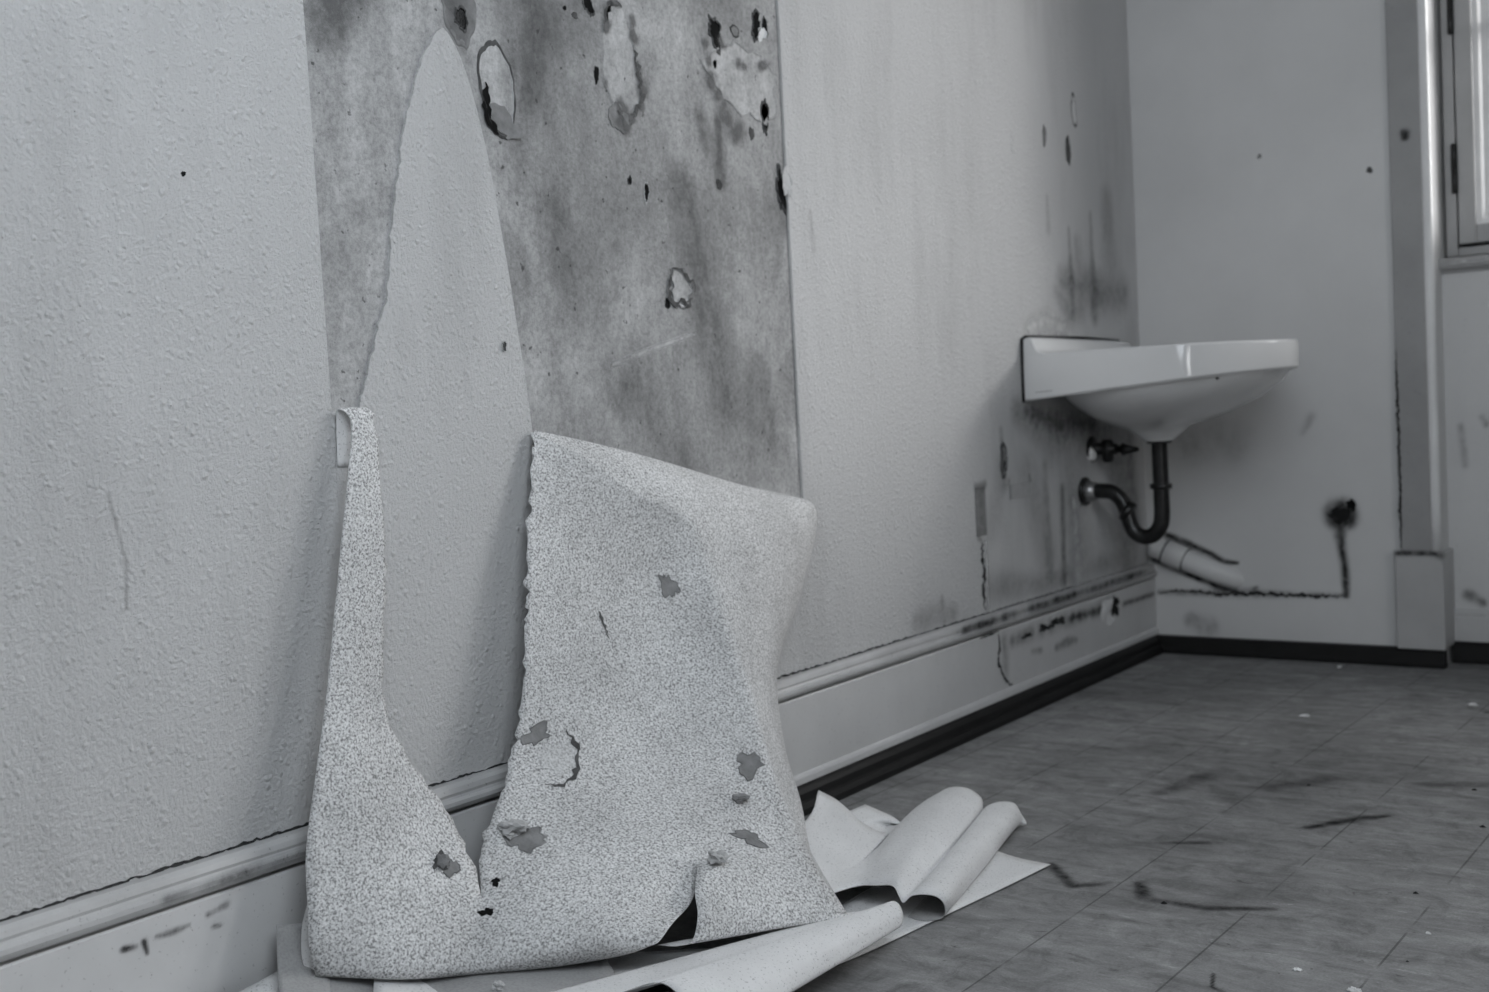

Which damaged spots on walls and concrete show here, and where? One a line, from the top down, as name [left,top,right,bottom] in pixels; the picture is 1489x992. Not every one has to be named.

damp [715,118,723,190]
peeling [303,0,803,787]
damp [963,496,1142,633]